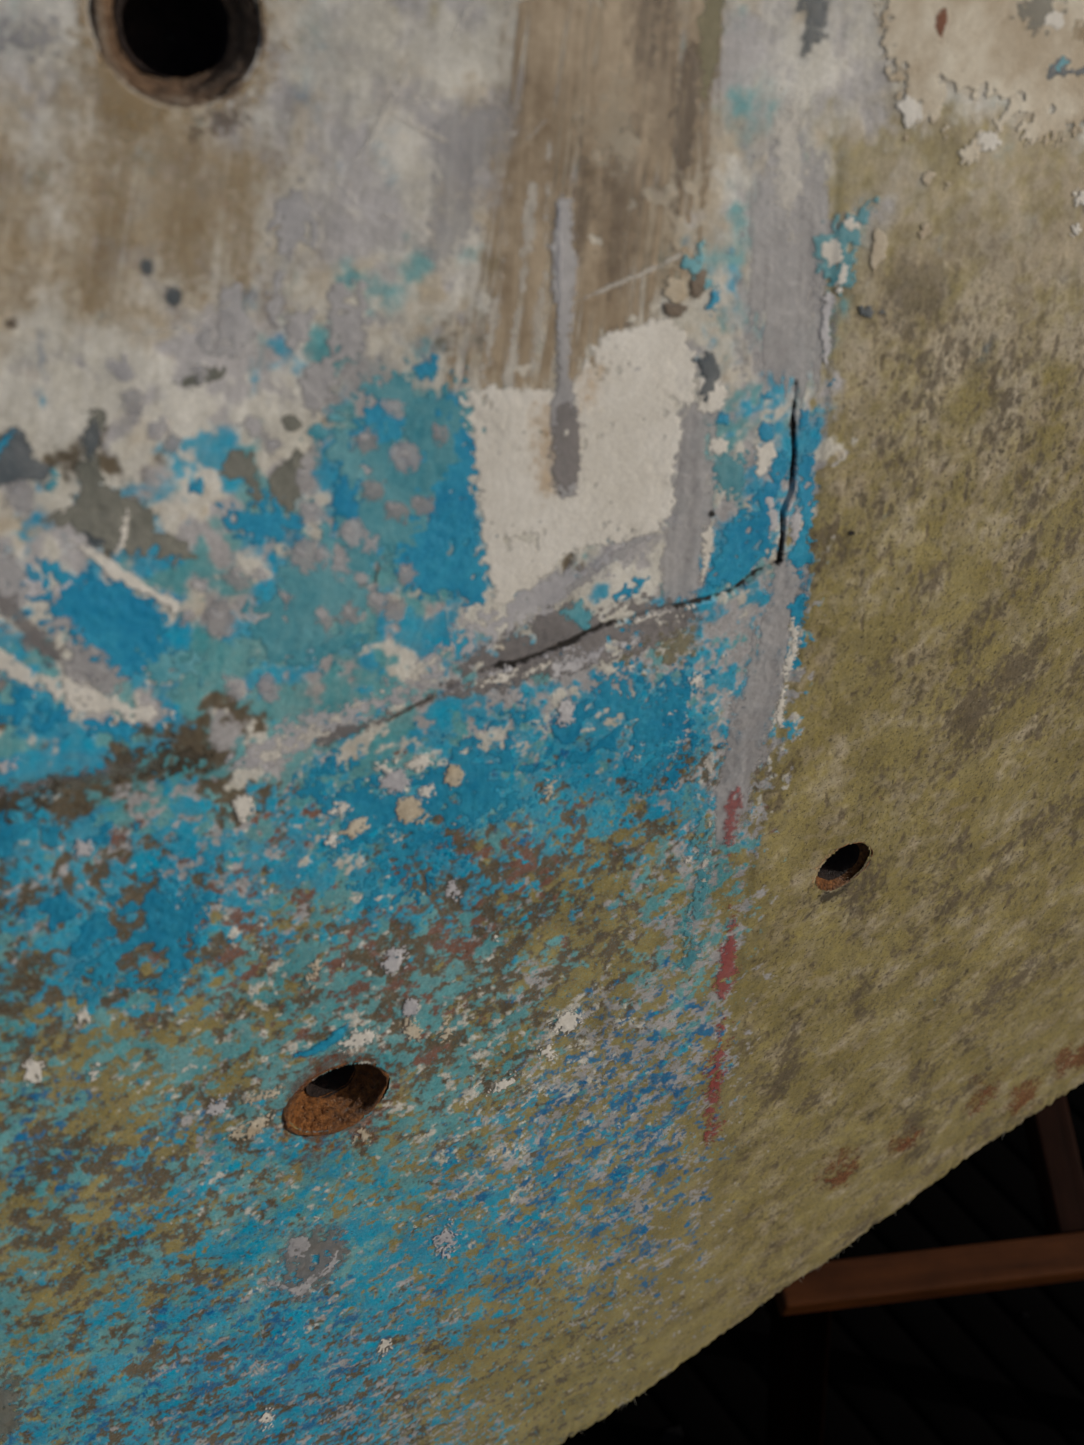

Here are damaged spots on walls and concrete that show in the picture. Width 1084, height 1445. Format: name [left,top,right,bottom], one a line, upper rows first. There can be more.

peeling [796,0,829,57]
peeling [875,0,1084,166]
peeling [173,366,226,387]
peeling [0,408,198,570]
peeling [189,105,889,913]
crack [389,381,797,720]
peeling [20,558,220,695]
peeling [0,676,143,743]
peeling [0,754,157,859]
peeling [13,836,233,1005]
rust [812,842,873,903]
rust [282,1061,389,1137]